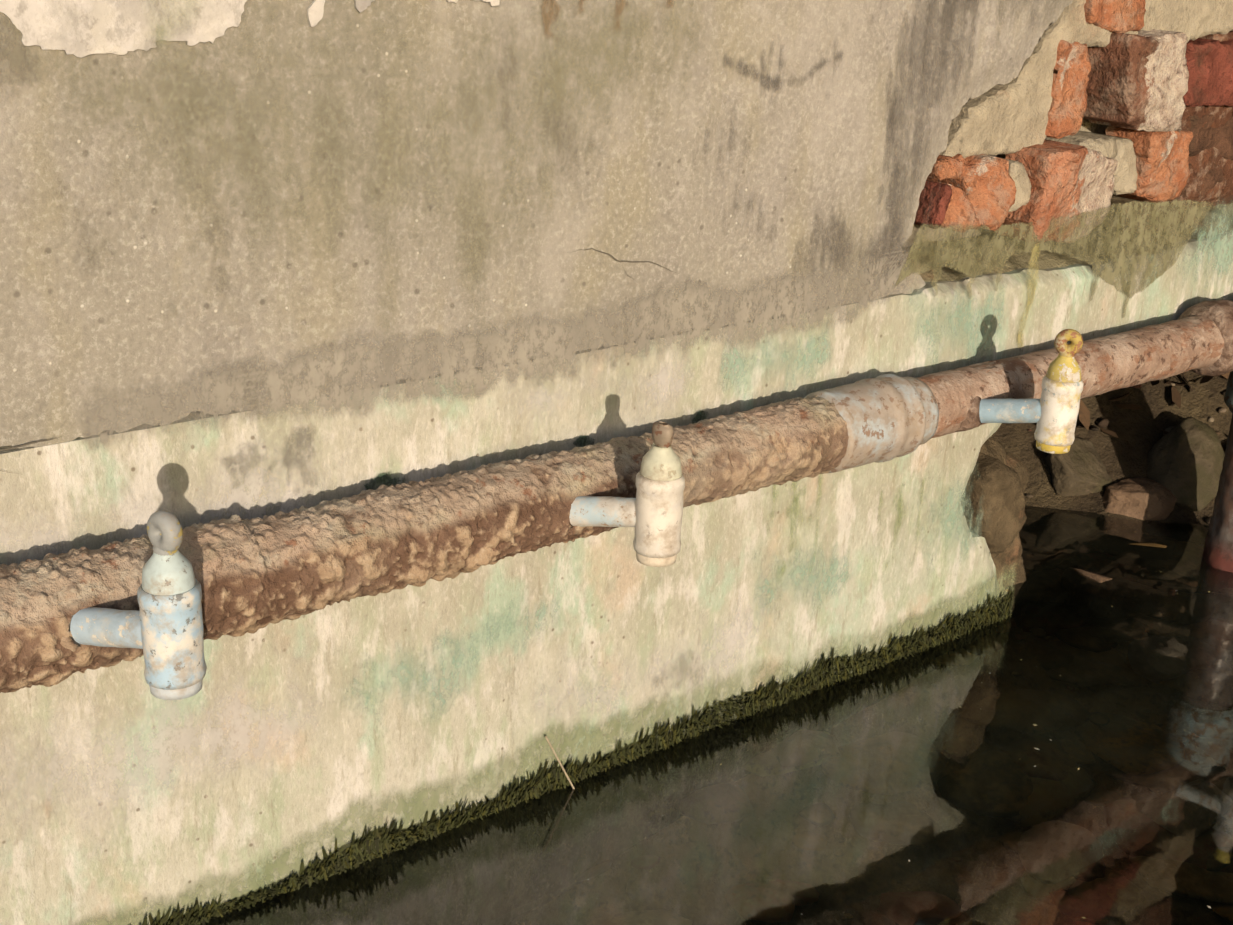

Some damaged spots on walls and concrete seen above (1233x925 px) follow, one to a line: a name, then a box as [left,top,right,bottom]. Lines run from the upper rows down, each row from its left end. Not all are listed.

peeling [0,0,247,58]
peeling [307,0,325,27]
spalling [914,0,1233,243]
water stain [871,92,1207,317]
water stain [220,459,274,516]